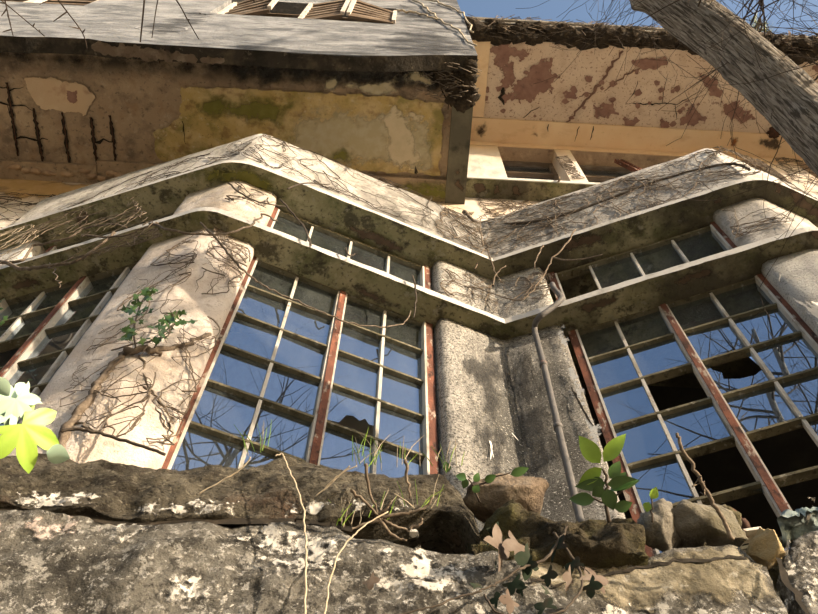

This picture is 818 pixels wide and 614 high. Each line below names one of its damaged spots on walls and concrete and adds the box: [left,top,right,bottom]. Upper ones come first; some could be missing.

crack [0,87,33,115]
spalling [5,82,123,181]
spalling [417,44,560,113]
crack [497,87,505,105]
crack [523,50,701,140]
peeling [562,76,680,126]
peeling [631,56,668,74]
water stain [464,352,561,475]